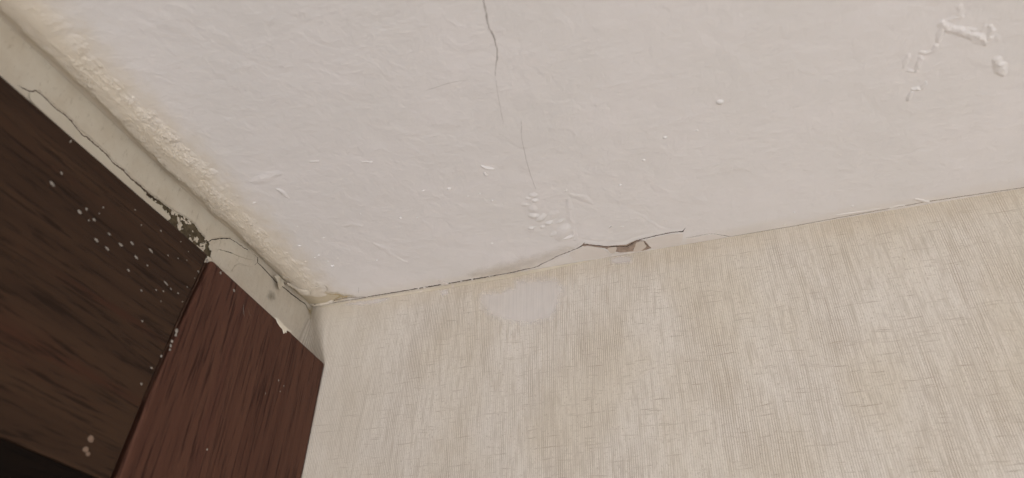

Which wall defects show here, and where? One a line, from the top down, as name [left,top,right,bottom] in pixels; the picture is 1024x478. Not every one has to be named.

crack [17,85,171,220]
peeling [0,0,339,307]
crack [483,0,534,184]
crack [202,236,585,309]
spalling [569,229,685,261]